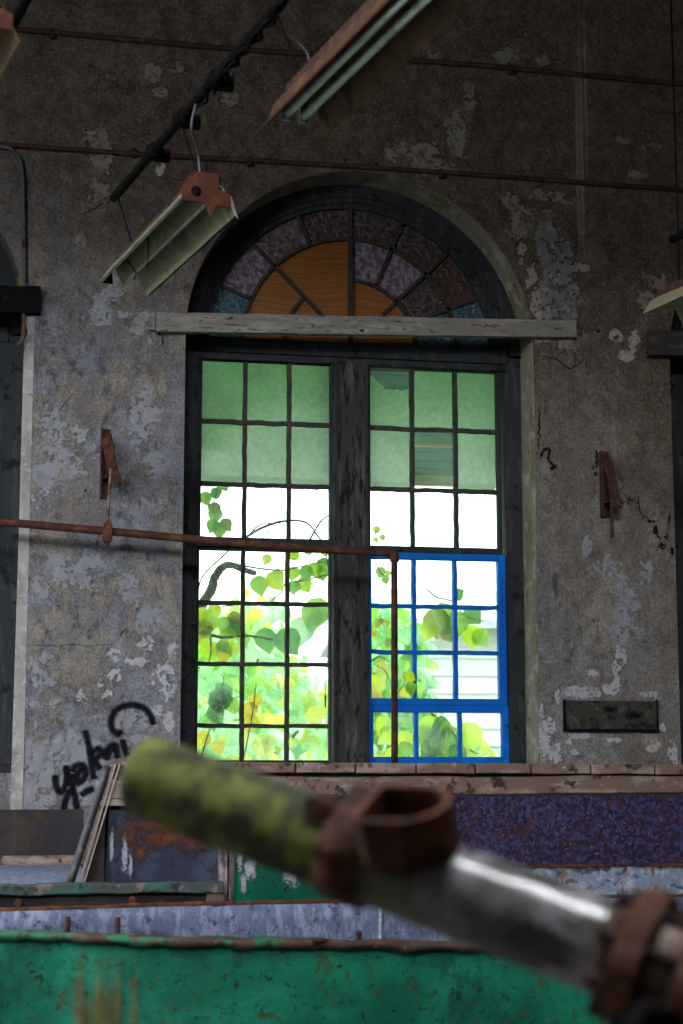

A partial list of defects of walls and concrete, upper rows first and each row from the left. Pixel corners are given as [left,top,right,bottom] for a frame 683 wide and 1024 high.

peeling [375,77,477,181]
peeling [88,276,156,346]
crack [542,350,584,370]
peeling [500,188,640,362]
peeling [31,397,90,502]
peeling [127,375,174,516]
crack [620,493,656,523]
peeling [24,538,179,810]
peeling [539,534,658,764]
peeling [645,723,678,764]
rust [119,813,204,862]